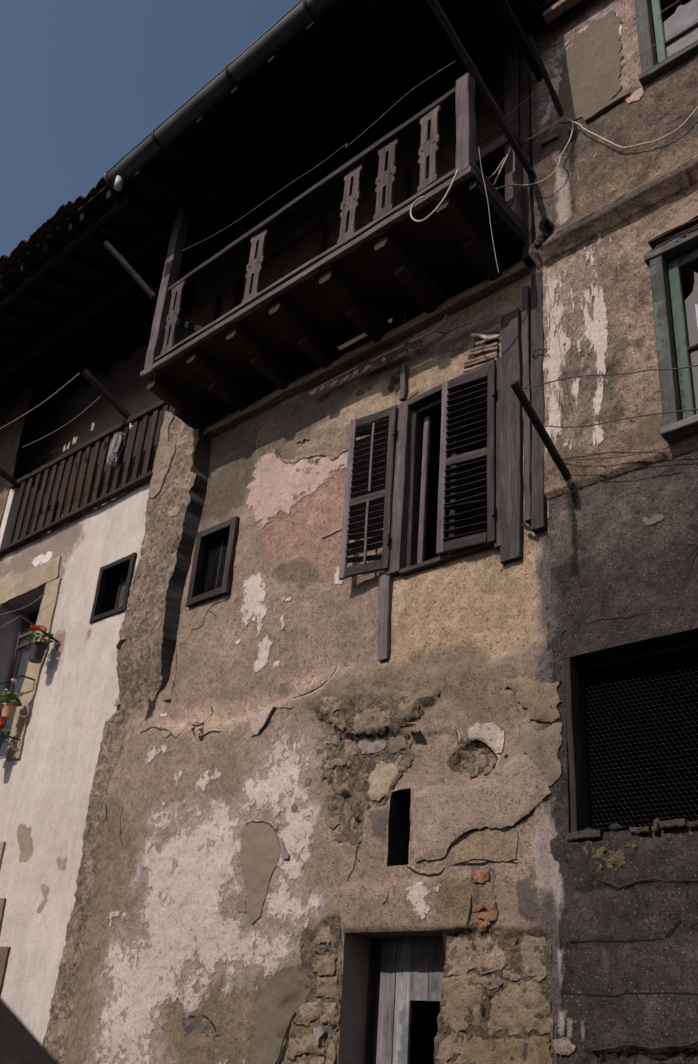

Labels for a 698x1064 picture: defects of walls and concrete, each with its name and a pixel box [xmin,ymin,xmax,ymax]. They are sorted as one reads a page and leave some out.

peeling [540,25,589,146]
flaking render [625,88,644,104]
peeling [542,227,612,452]
peeling [246,424,350,528]
peeling [240,572,280,672]
crack [140,704,221,738]
crack [252,664,340,737]
spalling [410,730,425,742]
peeling [84,718,328,1064]
peeling [406,882,440,919]